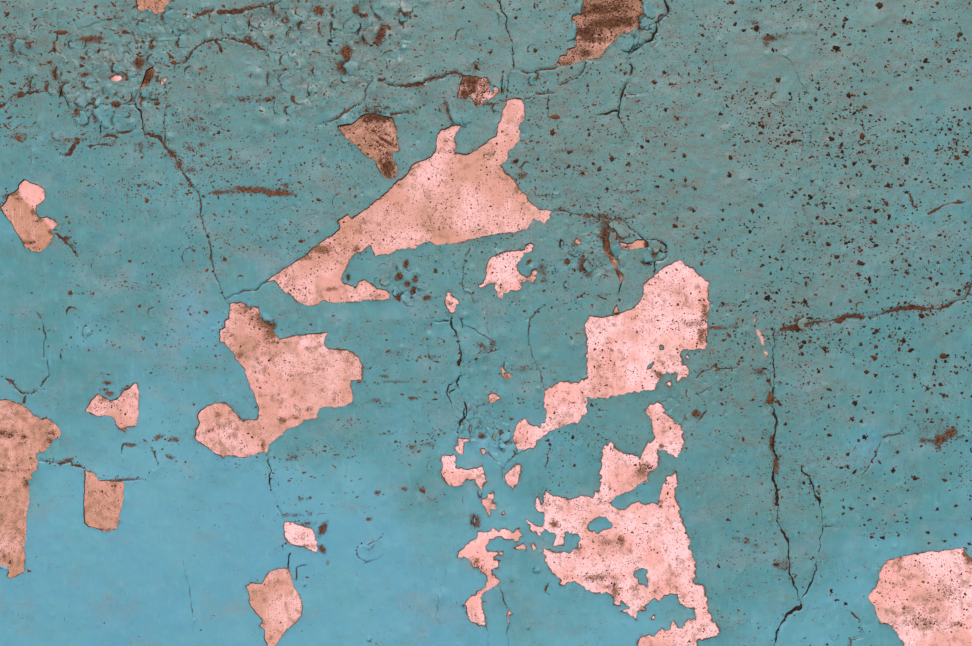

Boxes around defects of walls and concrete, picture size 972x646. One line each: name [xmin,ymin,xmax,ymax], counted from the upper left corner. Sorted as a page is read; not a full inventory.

crack [497,0,586,117]
peeling [0,179,58,252]
crack [0,76,269,304]
peeling [266,73,552,307]
peeling [0,399,61,578]
peeling [83,470,124,532]
peeling [195,302,363,458]
peeling [441,238,720,646]
crack [694,360,743,420]
crack [766,279,972,646]
peeling [246,568,303,646]
peeling [868,547,972,646]